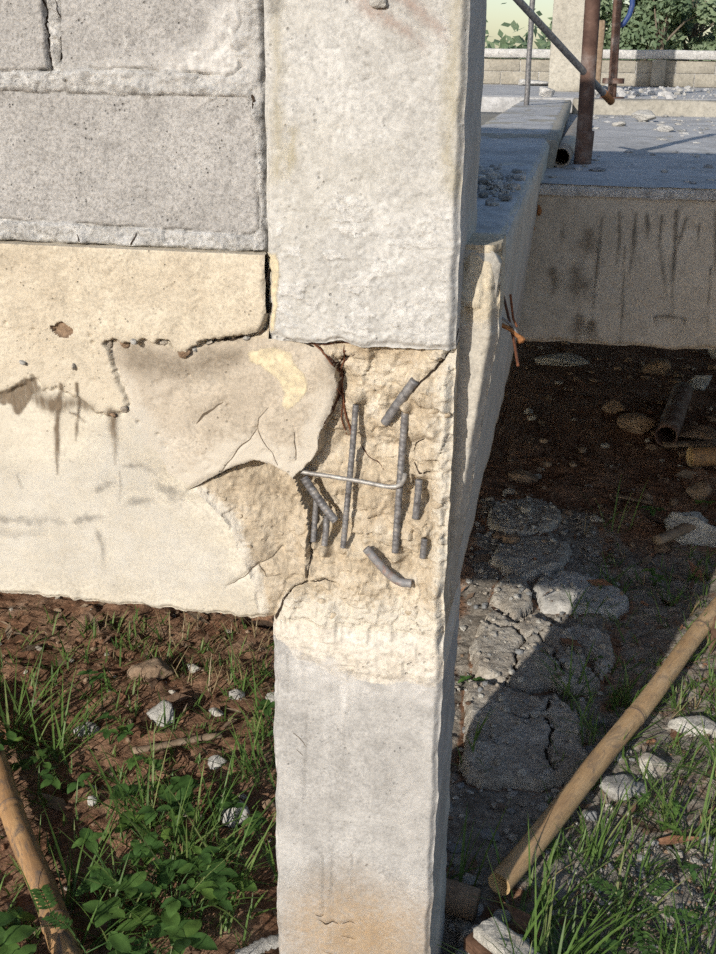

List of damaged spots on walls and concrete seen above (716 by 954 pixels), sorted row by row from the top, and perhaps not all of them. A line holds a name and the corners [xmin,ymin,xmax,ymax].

crack [6,235,106,245]
peeling [330,192,372,238]
spalling [50,321,73,338]
crack [212,250,272,341]
water stain [0,377,89,466]
water stain [107,409,116,436]
crack [196,402,223,424]
crack [189,408,296,490]
spalling [106,261,460,639]
crack [229,483,334,619]